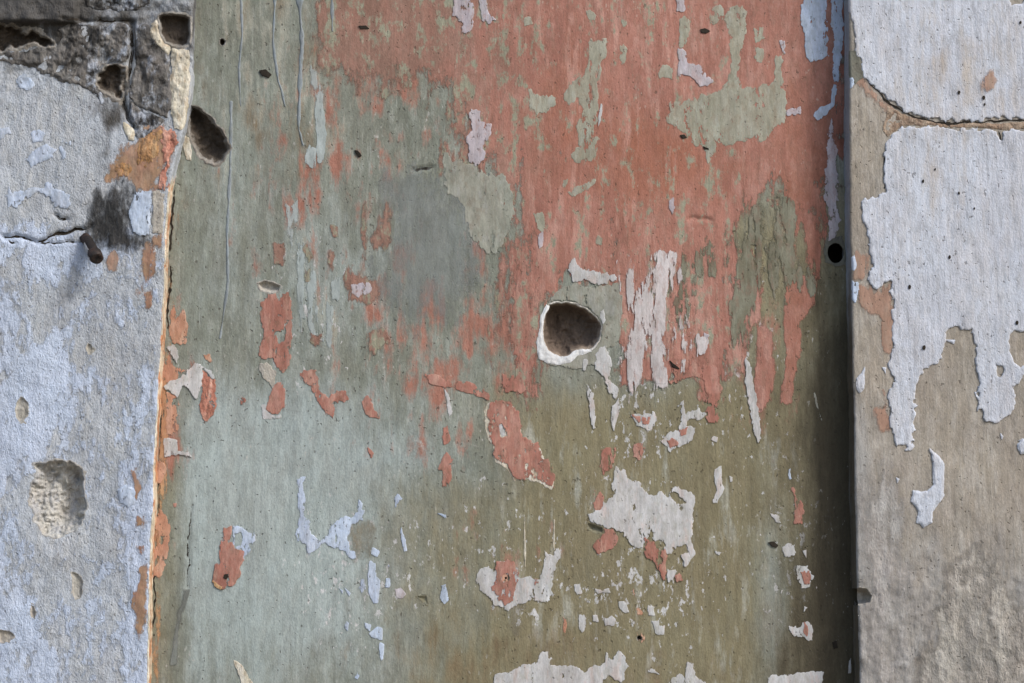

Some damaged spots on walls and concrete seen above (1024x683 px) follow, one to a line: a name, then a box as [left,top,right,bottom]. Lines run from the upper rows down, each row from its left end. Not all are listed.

spalling [0,0,192,161]
crack [866,79,1024,188]
crack [4,215,86,244]
rust [138,234,162,309]
peeling [300,0,1024,490]
peeling [155,256,217,483]
spalling [27,458,89,539]
rust [131,377,169,679]
peeling [476,520,563,611]
peeling [586,447,695,583]
peeling [494,651,629,683]
peeling [768,671,824,683]